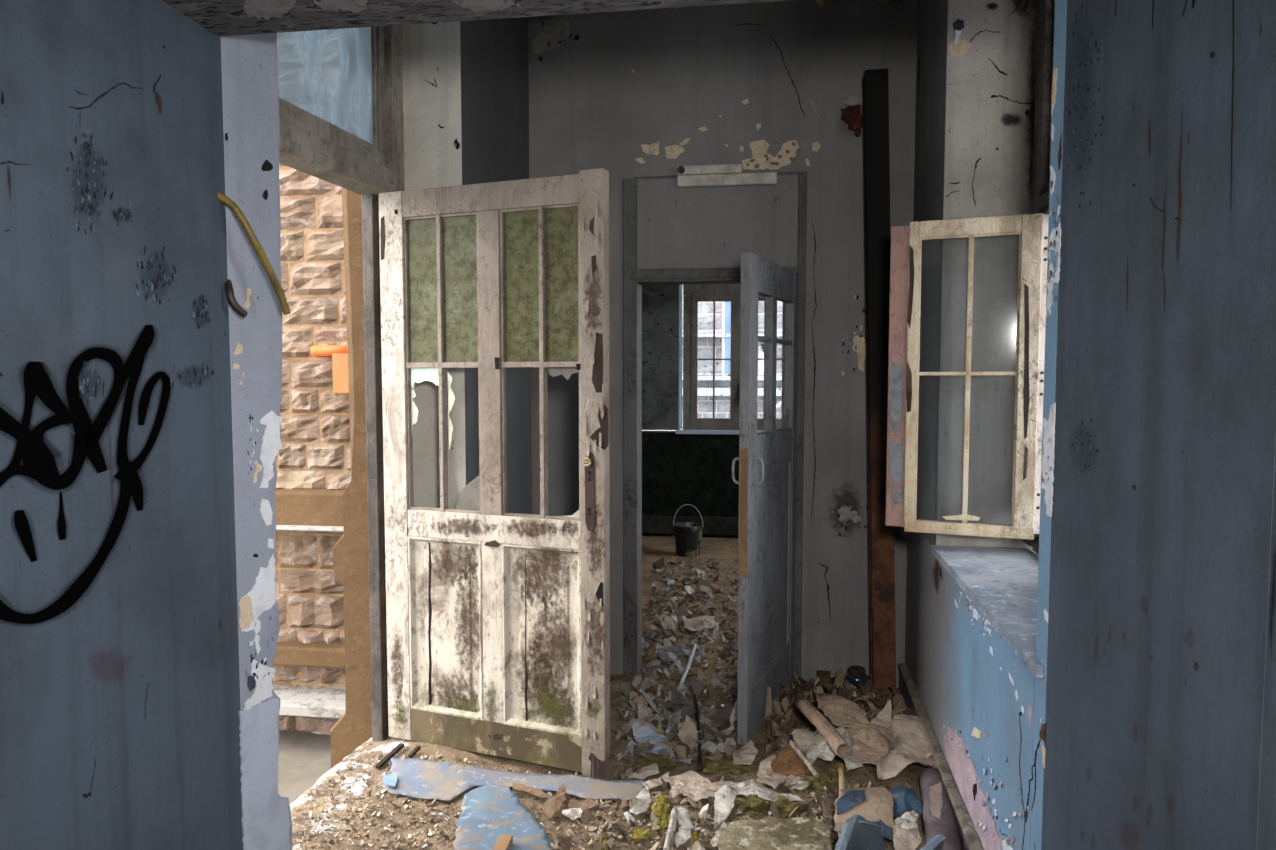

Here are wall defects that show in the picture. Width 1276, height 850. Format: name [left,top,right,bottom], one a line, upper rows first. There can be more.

peeling [243,0,296,20]
peeling [310,0,368,13]
peeling [455,0,522,12]
crack [68,75,161,113]
peeling [635,126,708,164]
peeling [724,123,821,170]
peeling [1045,68,1062,318]
peeling [232,342,245,388]
peeling [239,410,291,850]
peeling [955,591,1047,768]
peeling [943,709,1029,850]
crack [1019,716,1041,850]